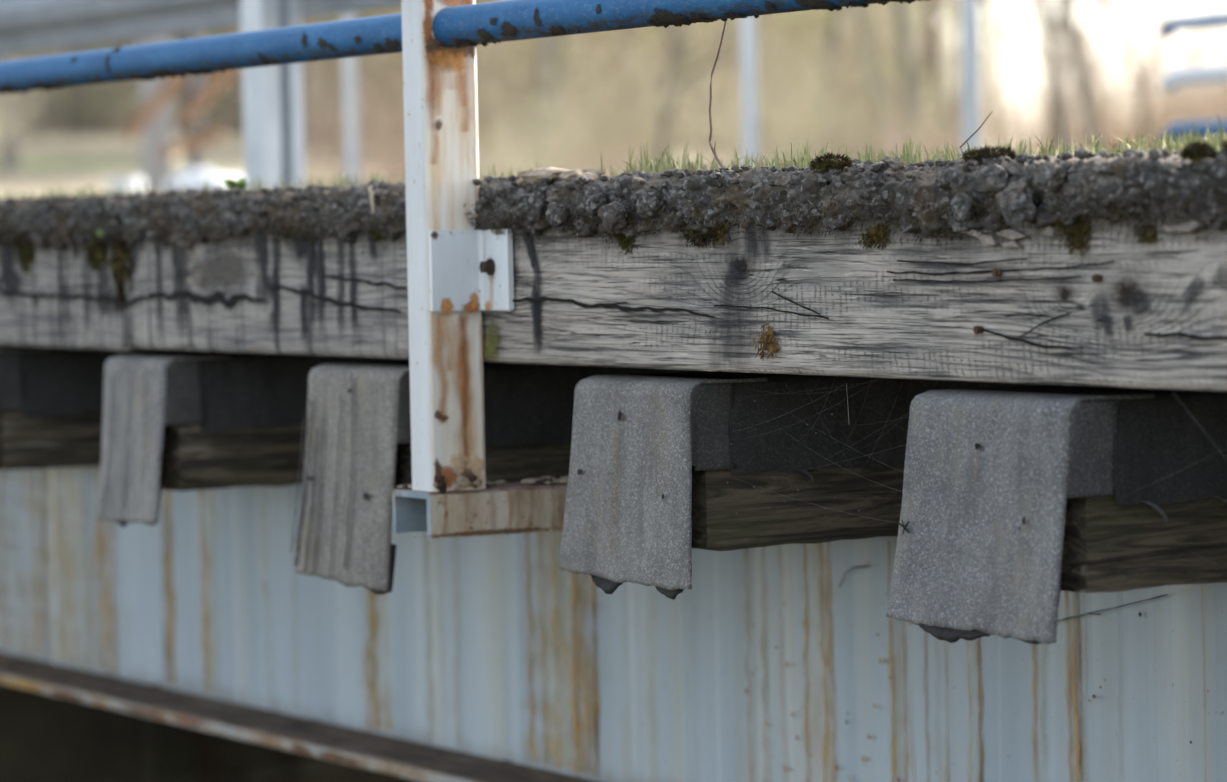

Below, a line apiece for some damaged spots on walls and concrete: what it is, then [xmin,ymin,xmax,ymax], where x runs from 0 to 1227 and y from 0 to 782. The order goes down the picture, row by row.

rust [423,0,476,130]
damp [0,241,20,297]
damp [130,235,187,323]
crack [0,276,407,348]
damp [255,230,356,337]
crack [513,291,829,320]
rust [434,275,492,488]
rust [550,573,598,768]
rust [1068,634,1081,781]